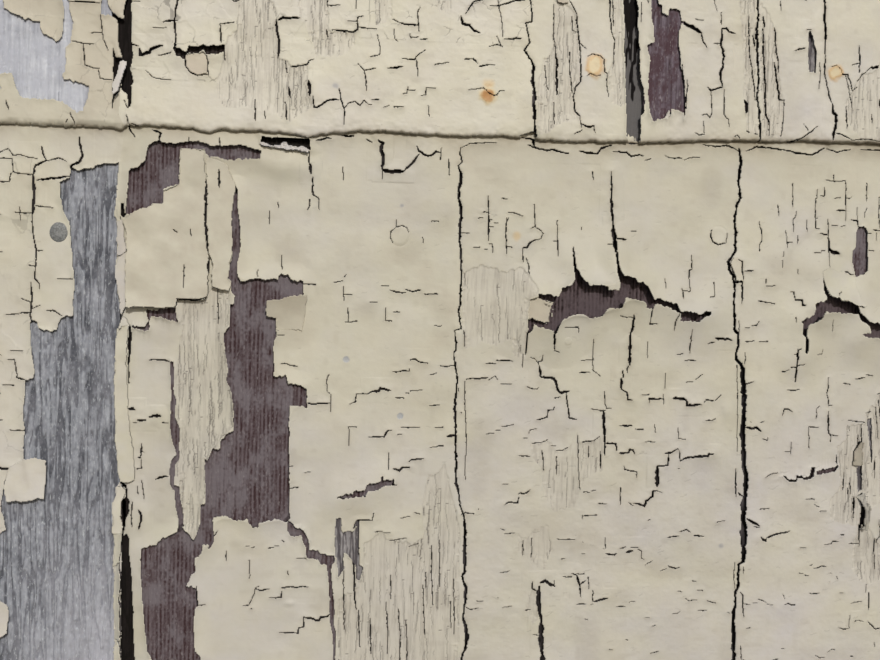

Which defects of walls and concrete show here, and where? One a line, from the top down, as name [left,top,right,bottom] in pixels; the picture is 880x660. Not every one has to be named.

crack [0,112,84,322]
peeling [0,136,461,660]
crack [254,0,525,210]
rust [476,83,500,106]
peeling [462,265,705,360]
crack [308,175,880,660]
rust [582,50,608,81]
peeling [607,0,687,144]
crack [529,0,880,252]
peeling [784,395,880,584]
peeling [802,226,880,339]
crack [279,513,480,660]